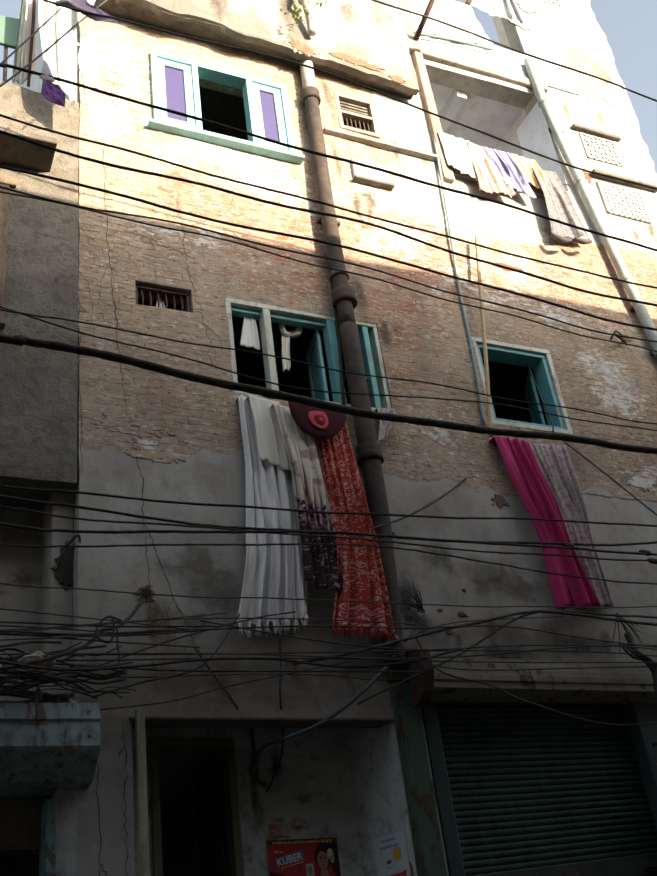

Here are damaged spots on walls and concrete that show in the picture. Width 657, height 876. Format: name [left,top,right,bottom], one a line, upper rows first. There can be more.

spalling [289,40,406,87]
flaking render [561,51,615,106]
crack [78,147,126,402]
crack [132,196,223,369]
crack [131,436,224,695]
flaking render [491,494,510,509]
flaking render [625,477,657,492]
crack [96,726,128,876]